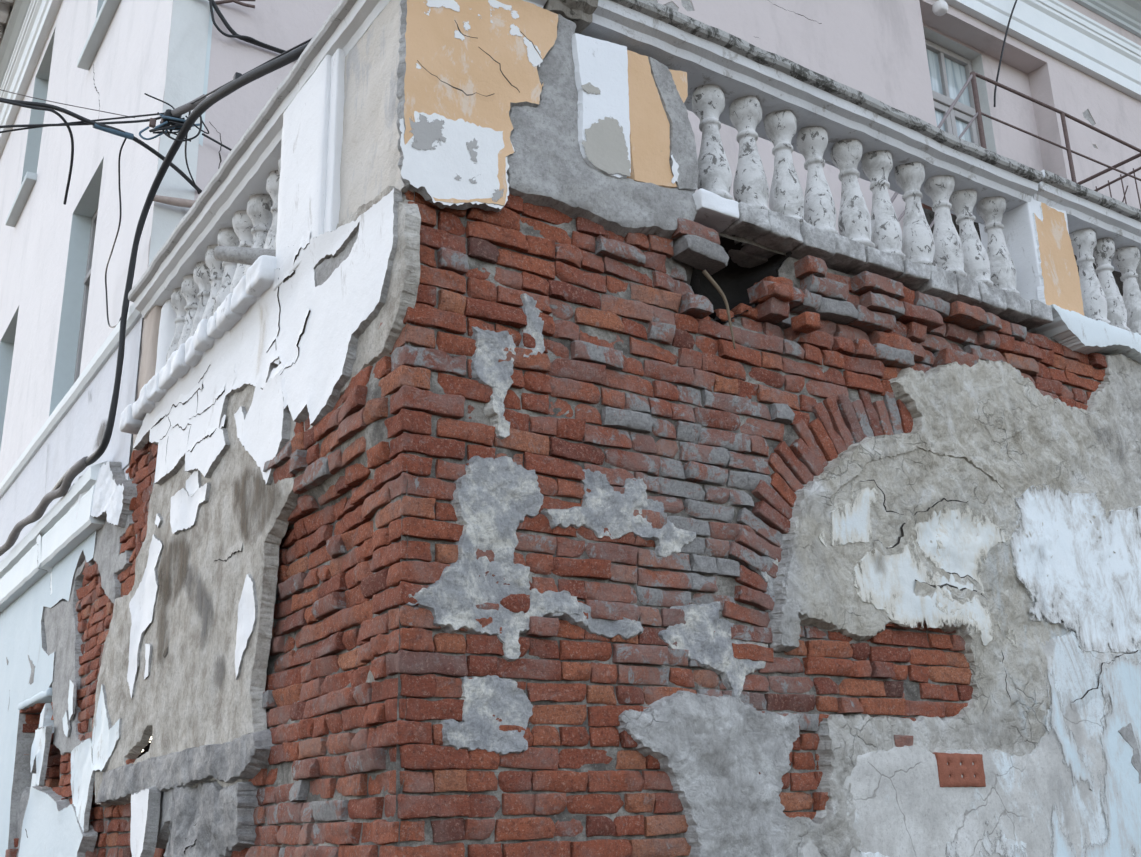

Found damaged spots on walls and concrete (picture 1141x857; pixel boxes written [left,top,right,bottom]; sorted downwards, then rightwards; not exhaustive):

crack [416,20,520,102]
peeling [424,0,543,68]
spalling [581,82,601,94]
spalling [665,0,694,11]
spalling [248,111,1141,857]
spalling [5,441,211,857]
peeling [235,574,258,680]